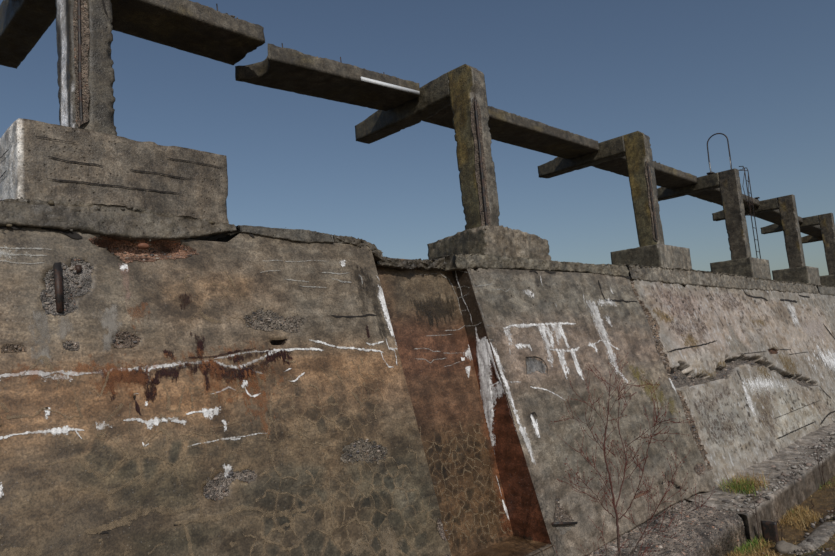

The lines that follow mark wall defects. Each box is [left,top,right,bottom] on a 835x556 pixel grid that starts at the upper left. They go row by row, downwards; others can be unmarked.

spalling [88,236,199,263]
spalling [40,257,94,316]
spalling [244,308,306,345]
leakage [504,290,628,383]
leakage [0,425,84,440]
leakage [123,400,227,442]
corrosion [96,332,292,402]
crack [80,270,510,556]
leakage [461,327,540,462]
crack [669,340,835,439]
spalling [203,465,257,501]
crack [0,535,27,556]